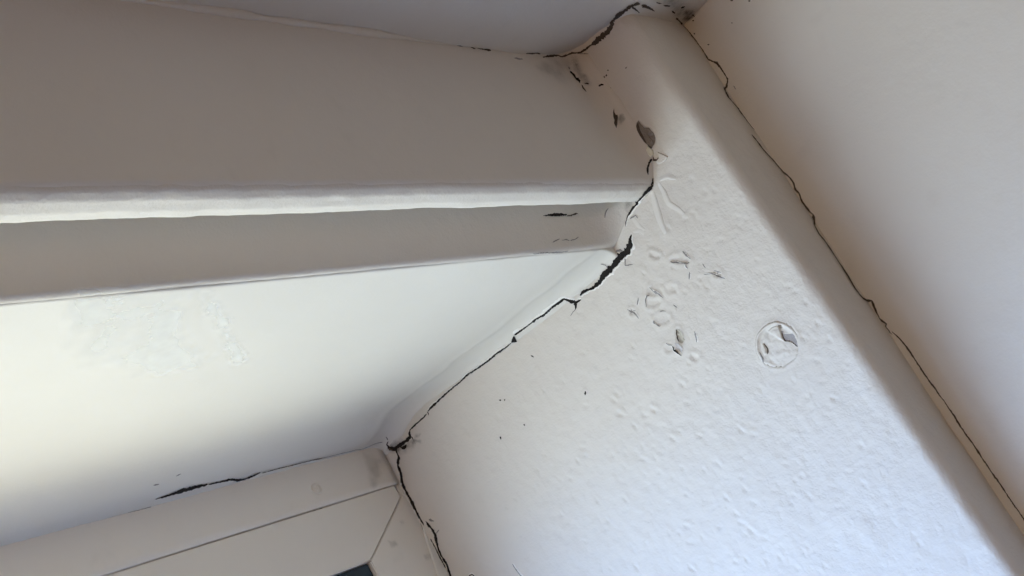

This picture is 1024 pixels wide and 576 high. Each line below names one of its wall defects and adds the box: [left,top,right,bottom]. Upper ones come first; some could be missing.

crack [128,157,658,576]
spalling [636,121,668,164]
spalling [675,329,685,353]
crack [515,2,1024,520]